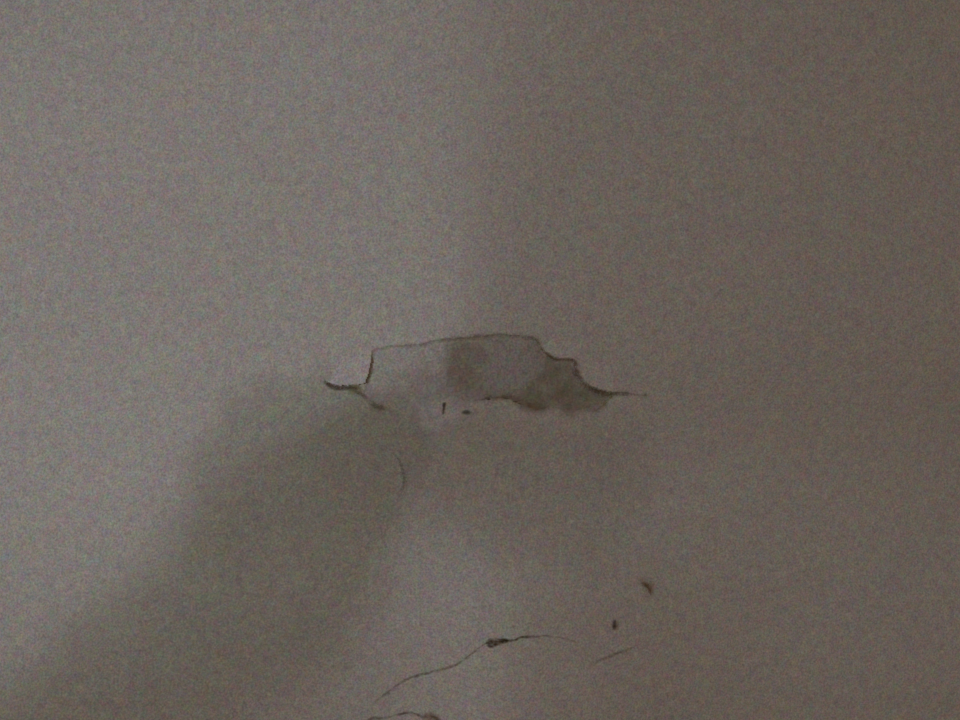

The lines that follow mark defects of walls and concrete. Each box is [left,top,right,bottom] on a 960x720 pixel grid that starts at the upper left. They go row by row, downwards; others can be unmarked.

peeling [325,334,627,412]
crack [486,636,530,647]